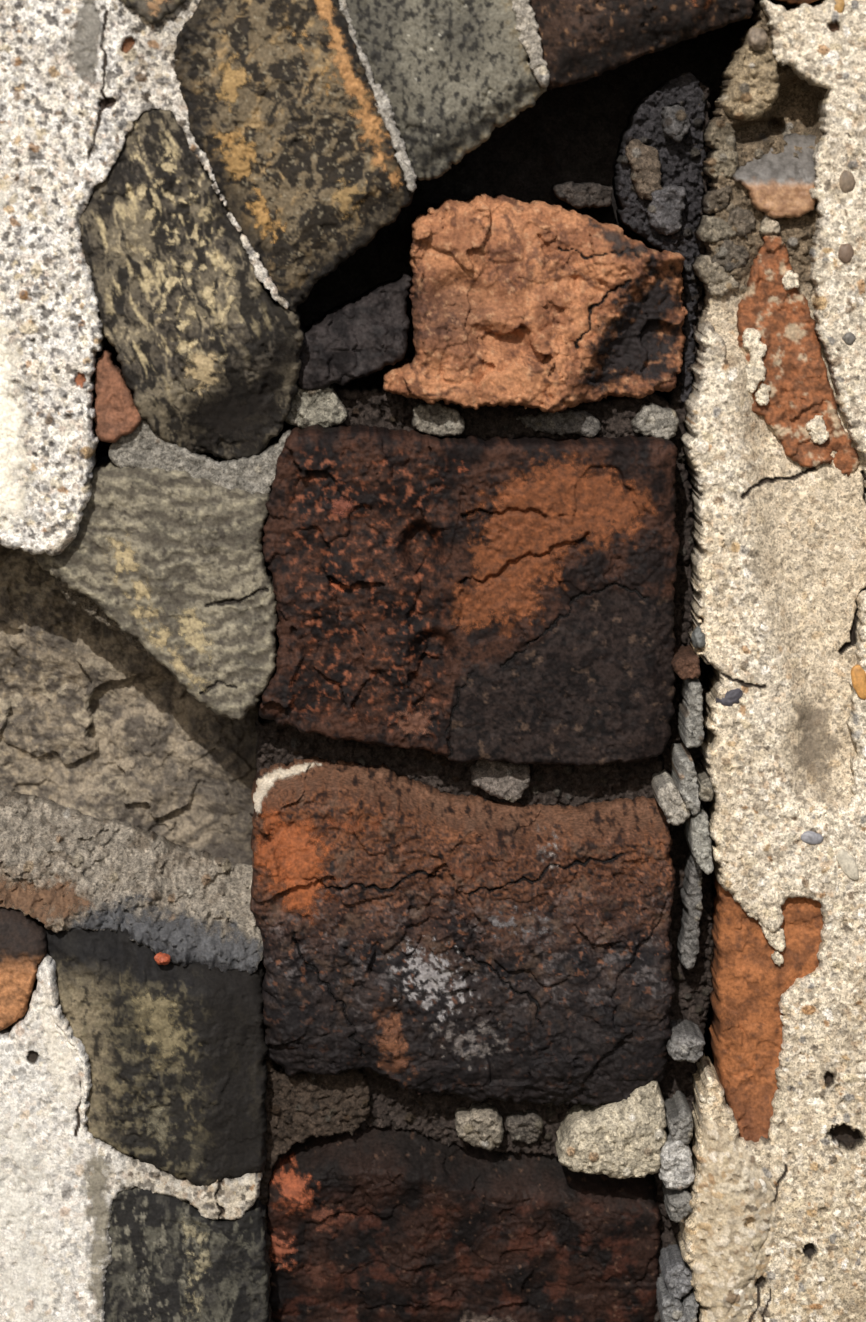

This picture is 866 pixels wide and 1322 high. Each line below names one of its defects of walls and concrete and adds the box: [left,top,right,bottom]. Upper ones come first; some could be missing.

crack [88,10,108,159]
spalling [691,4,866,819]
crack [741,467,816,499]
crack [858,471,866,503]
crack [255,82,767,1157]
crack [839,587,866,654]
spalling [709,871,823,1142]
crack [654,1173,680,1322]
crack [749,1280,771,1322]
crack [774,1164,787,1201]